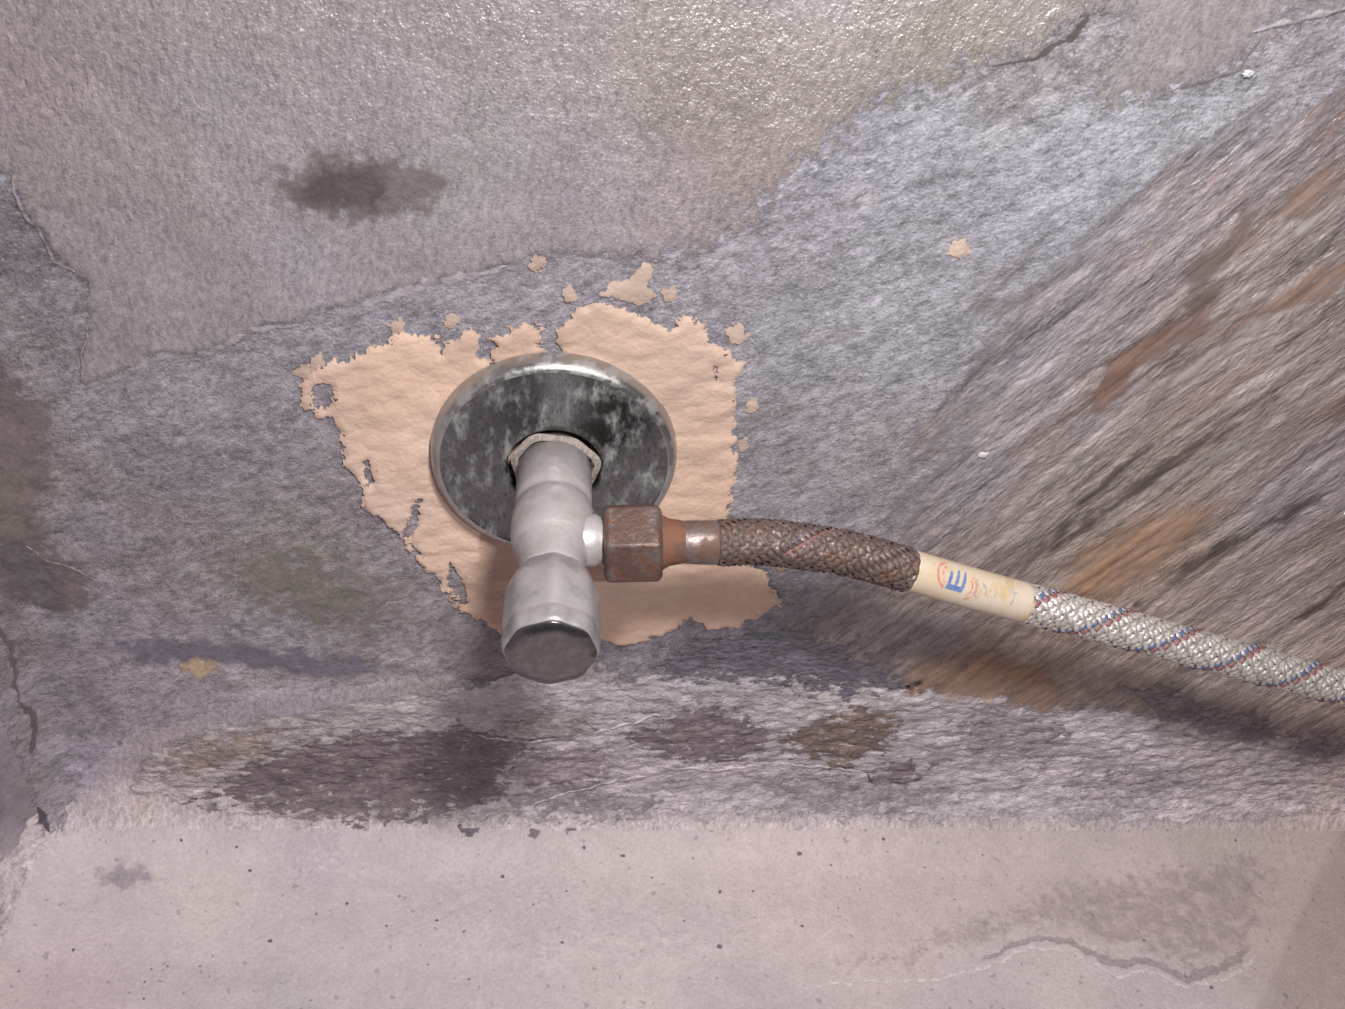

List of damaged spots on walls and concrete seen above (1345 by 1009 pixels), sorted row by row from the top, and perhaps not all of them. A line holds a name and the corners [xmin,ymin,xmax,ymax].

damp [280,152,446,222]
damp [0,363,95,611]
crack [0,628,38,755]
peeling [867,653,896,677]
spalling [888,659,974,694]